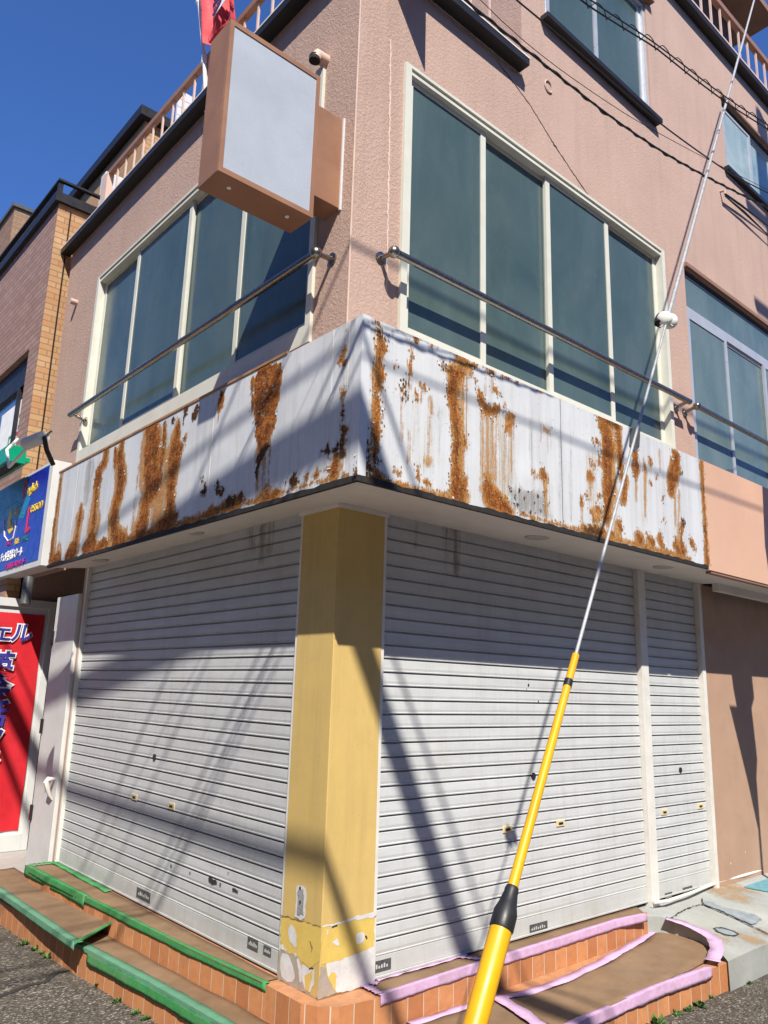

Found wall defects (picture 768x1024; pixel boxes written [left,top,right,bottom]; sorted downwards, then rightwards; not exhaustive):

rust [48,320,710,566]
peeling [277,885,375,999]